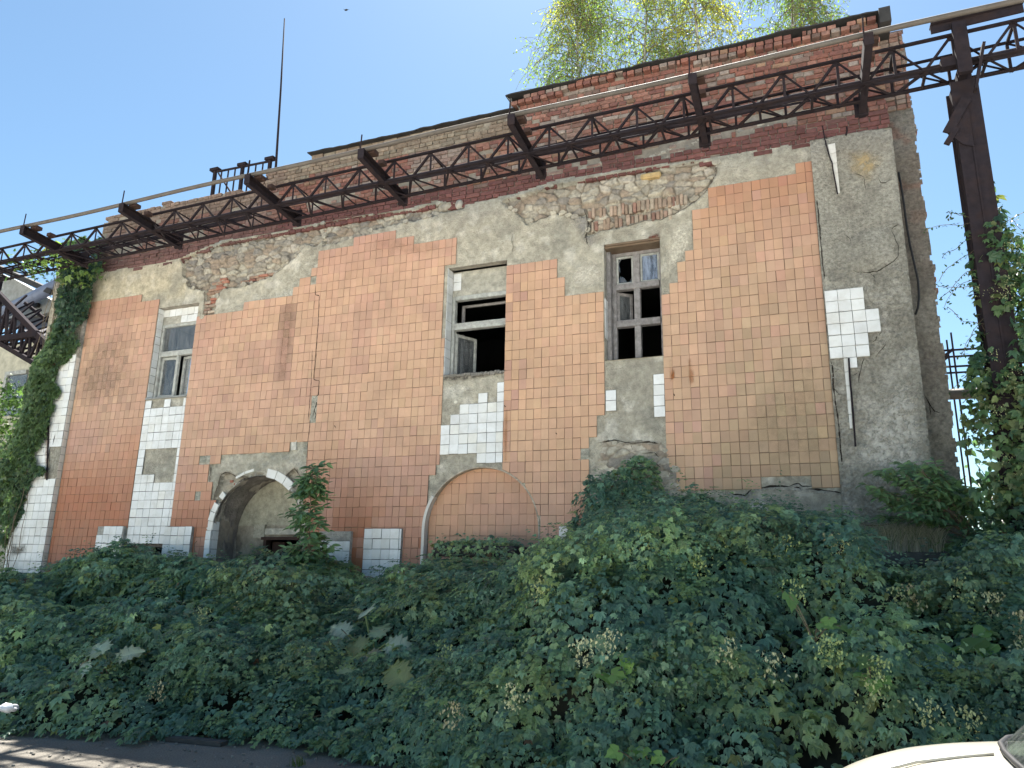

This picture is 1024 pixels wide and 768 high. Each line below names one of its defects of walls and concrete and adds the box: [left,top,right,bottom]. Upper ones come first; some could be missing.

spalling [719,109,798,135]
spalling [505,131,721,237]
spalling [182,200,463,319]
crack [306,286,319,473]
spalling [195,440,308,503]